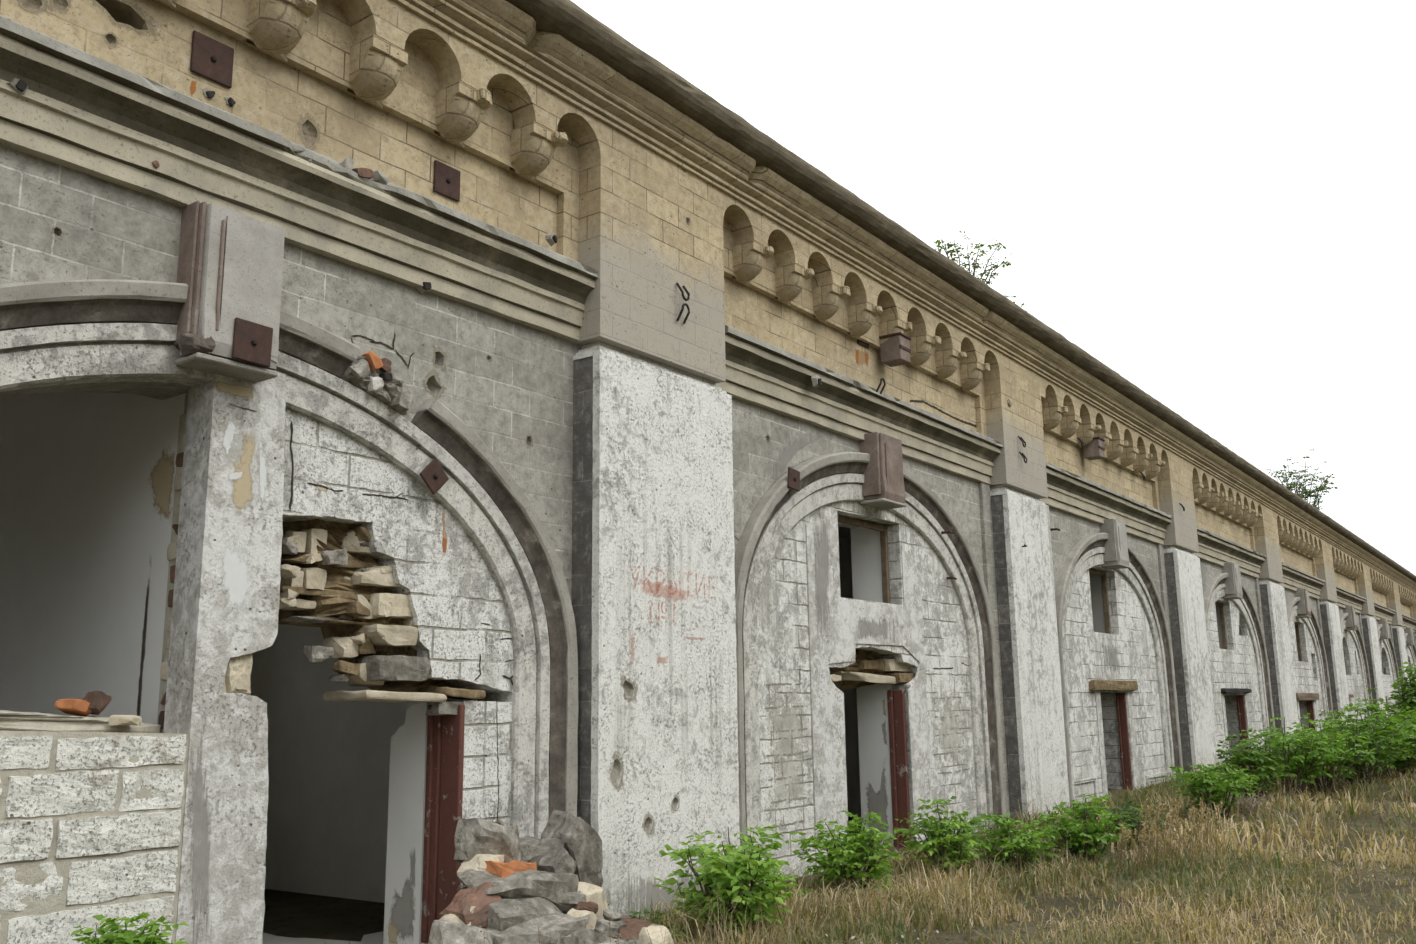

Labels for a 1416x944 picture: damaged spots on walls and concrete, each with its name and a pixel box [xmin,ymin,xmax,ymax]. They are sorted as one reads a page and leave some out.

peeling [223,421,267,509]
flaking render [280,529,430,687]